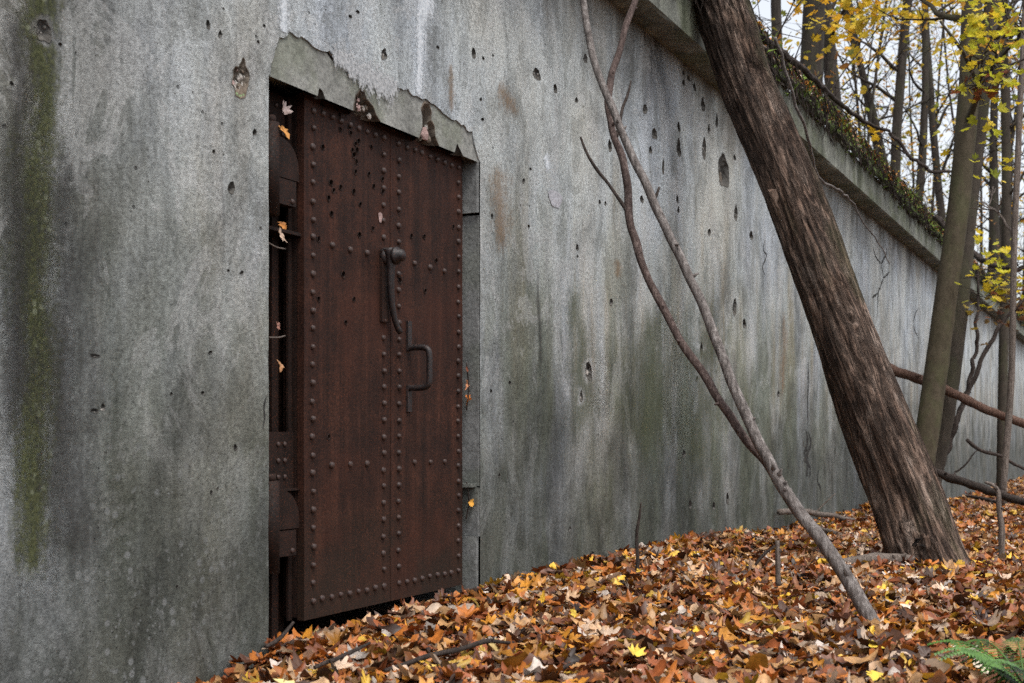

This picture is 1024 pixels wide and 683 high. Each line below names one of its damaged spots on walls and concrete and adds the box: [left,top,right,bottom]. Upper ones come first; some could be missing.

spalling [232,57,250,99]
flaking render [269,32,480,163]
spalling [718,152,736,188]
spalling [580,361,592,402]